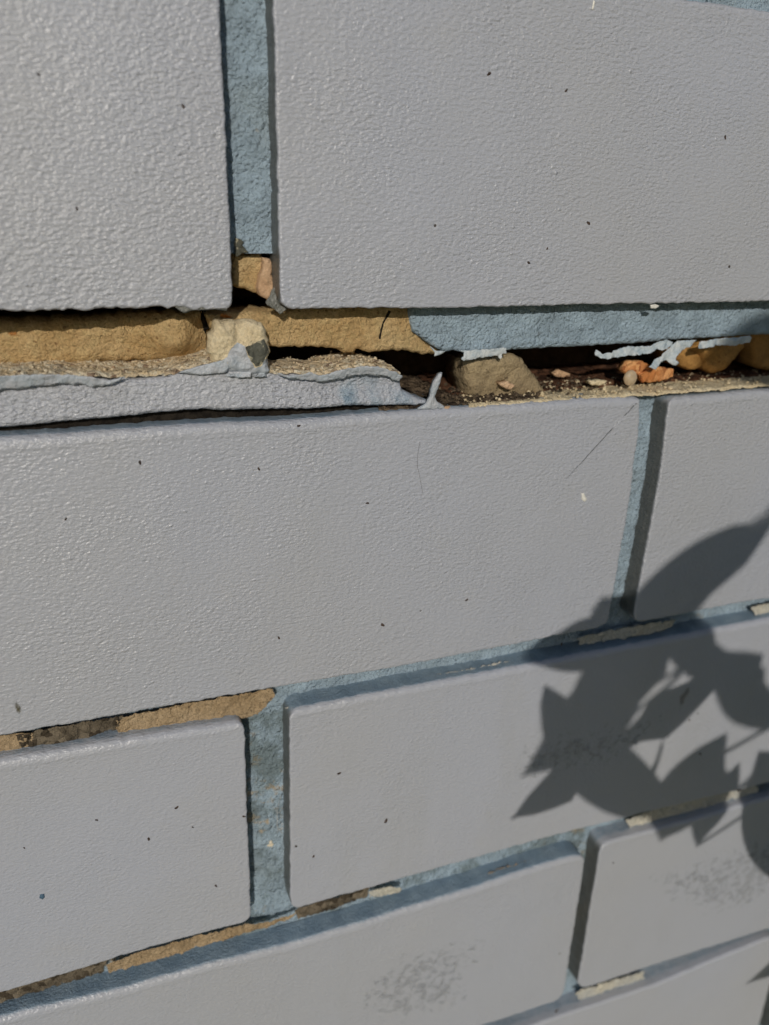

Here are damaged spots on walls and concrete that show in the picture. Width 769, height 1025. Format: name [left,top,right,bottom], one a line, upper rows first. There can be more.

spalling [0,238,445,363]
peeling [459,347,507,361]
peeling [595,335,752,370]
spalling [549,368,571,378]
spalling [496,380,515,390]
peeling [116,689,275,733]
peeling [0,733,33,751]
peeling [368,886,402,897]
peeling [106,913,296,973]